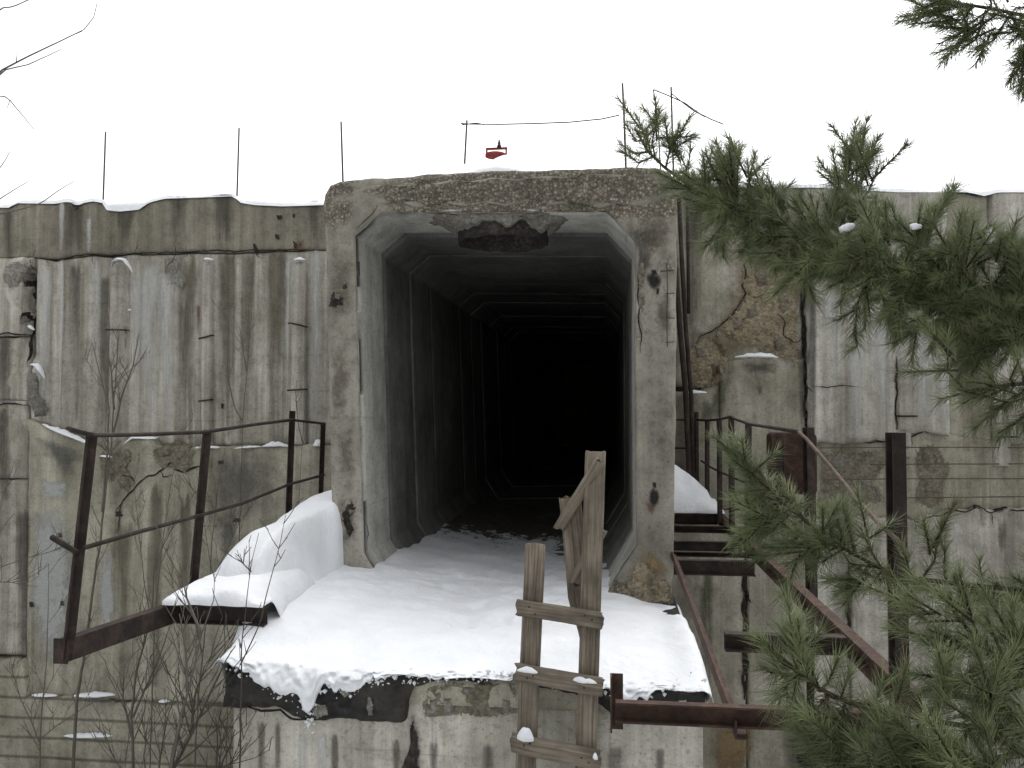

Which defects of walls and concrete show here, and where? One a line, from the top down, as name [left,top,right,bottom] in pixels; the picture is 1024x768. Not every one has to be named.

damp [216,194,229,226]
damp [94,261,109,395]
crack [0,245,315,361]
spalling [686,258,802,389]
crack [695,264,857,427]
crack [866,358,949,444]
damp [20,515,28,599]
spalling [342,502,355,537]
spalling [620,561,672,604]
corrosion [648,482,659,512]
crack [740,559,751,700]
spalling [402,682,517,768]